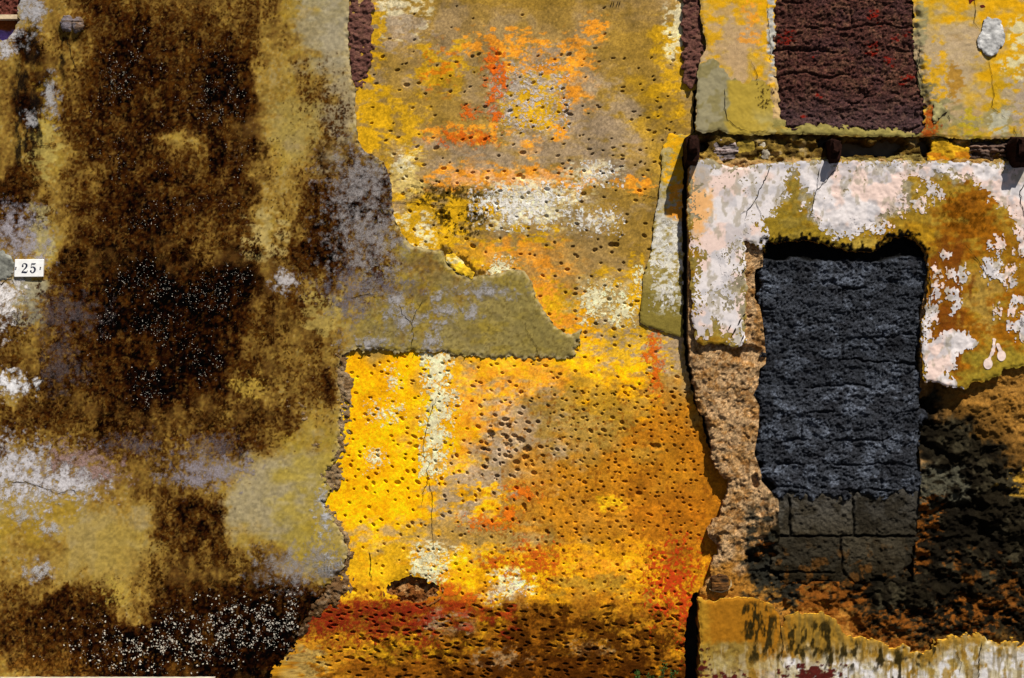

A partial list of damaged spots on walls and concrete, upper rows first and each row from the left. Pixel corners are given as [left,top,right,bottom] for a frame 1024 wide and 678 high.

damp [0,0,687,678]
flaking render [270,0,1024,678]
corrosion [631,529,708,665]